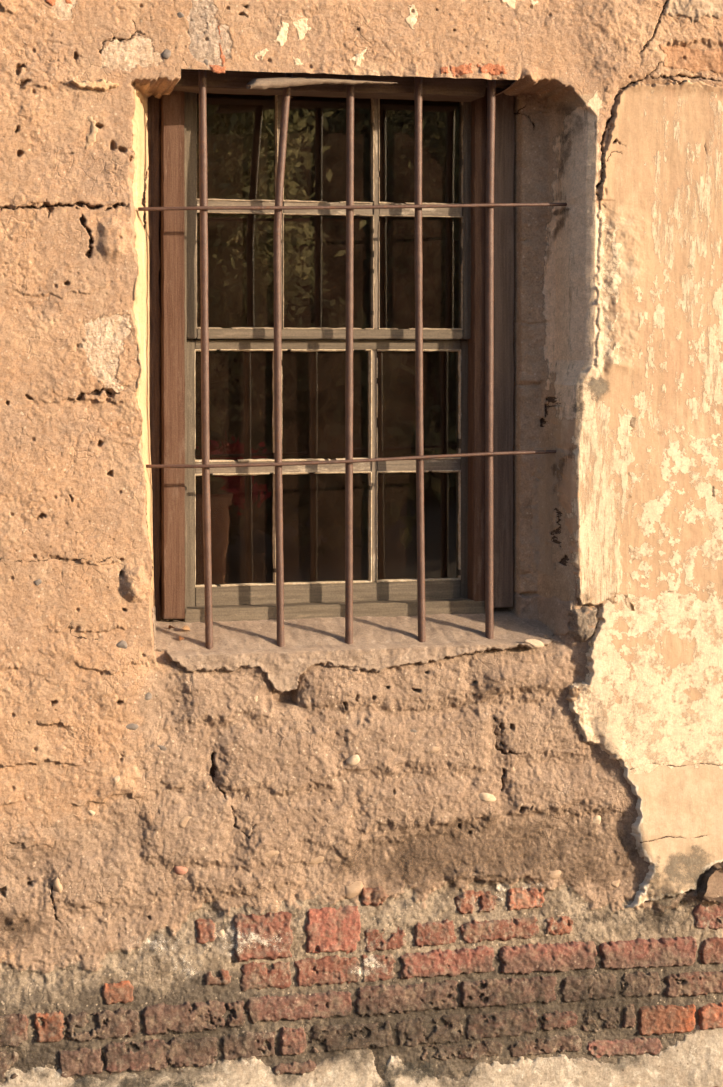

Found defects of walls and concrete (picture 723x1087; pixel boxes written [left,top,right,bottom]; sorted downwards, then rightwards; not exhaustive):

crack [596,1,717,200]
crack [0,169,148,258]
crack [540,396,561,427]
spalling [155,91,723,903]
crack [551,508,569,566]
crack [493,710,518,791]
crack [209,752,255,838]